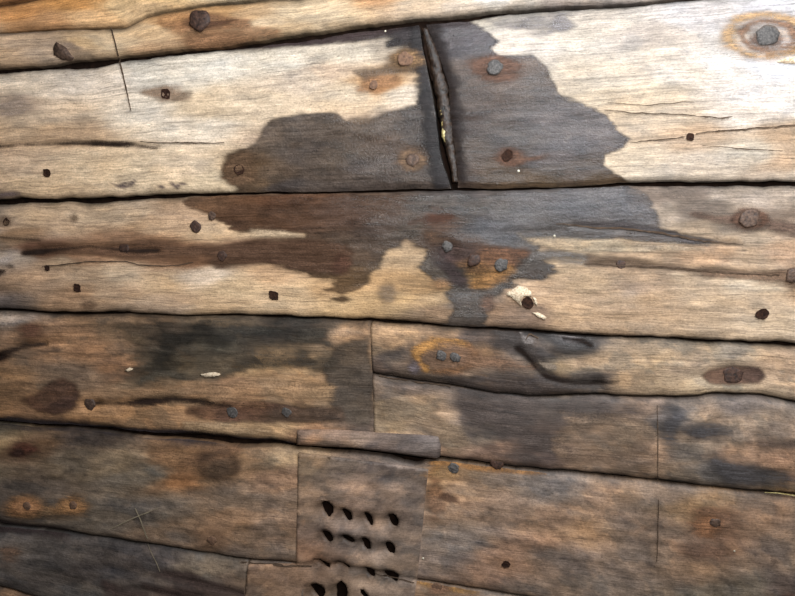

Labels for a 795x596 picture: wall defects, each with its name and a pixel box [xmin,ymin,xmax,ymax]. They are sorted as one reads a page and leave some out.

damp [508,13,573,34]
corrosion [358,49,424,92]
damp [24,22,784,467]
corrosion [425,215,529,288]
crack [516,333,569,383]
crack [563,337,593,347]
damp [0,416,92,430]
damp [712,459,795,486]